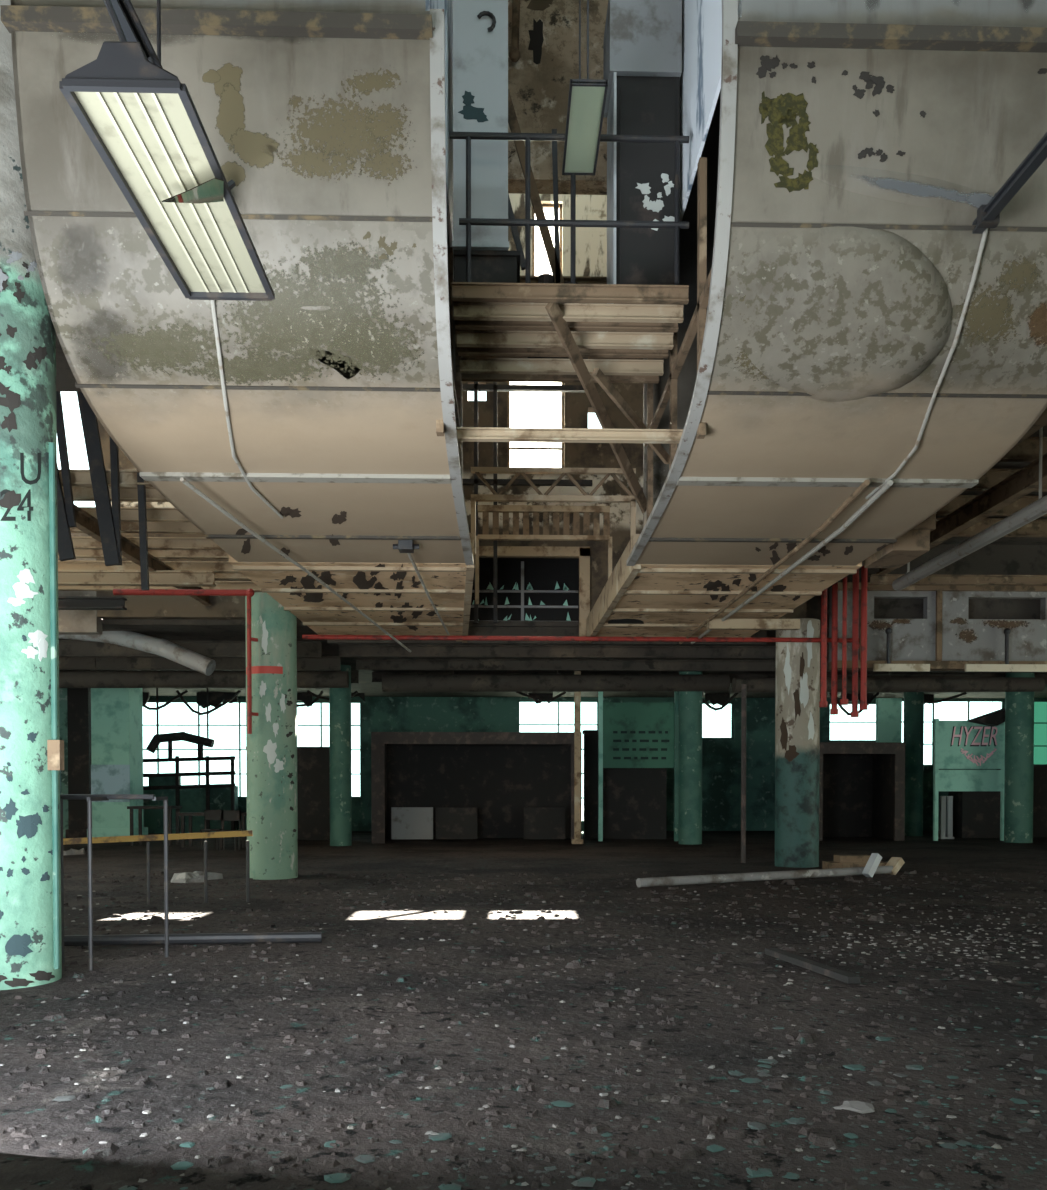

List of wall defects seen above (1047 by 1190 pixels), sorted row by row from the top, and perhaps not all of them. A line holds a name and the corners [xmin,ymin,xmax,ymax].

peeling [842,70,895,117]
peeling [756,55,819,193]
peeling [635,173,675,231]
peeling [0,346,48,433]
peeling [7,569,38,606]
peeling [279,564,436,631]
peeling [21,630,48,662]
peeling [780,620,815,762]
peeling [0,762,50,839]
peeling [0,856,50,881]
peeling [0,933,33,957]
spalling [0,971,55,987]